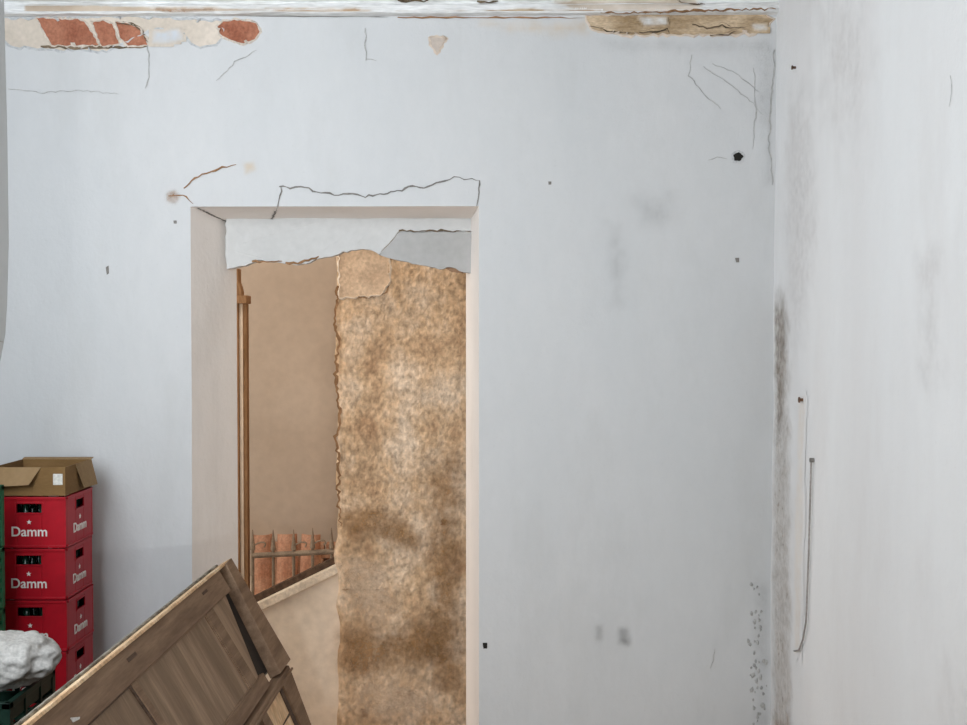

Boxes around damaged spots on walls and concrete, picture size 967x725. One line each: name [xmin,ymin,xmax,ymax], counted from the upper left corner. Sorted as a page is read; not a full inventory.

spalling [4,4,375,54]
spalling [439,0,776,38]
crack [168,164,236,222]
crack [271,176,480,219]
spalling [337,250,392,300]